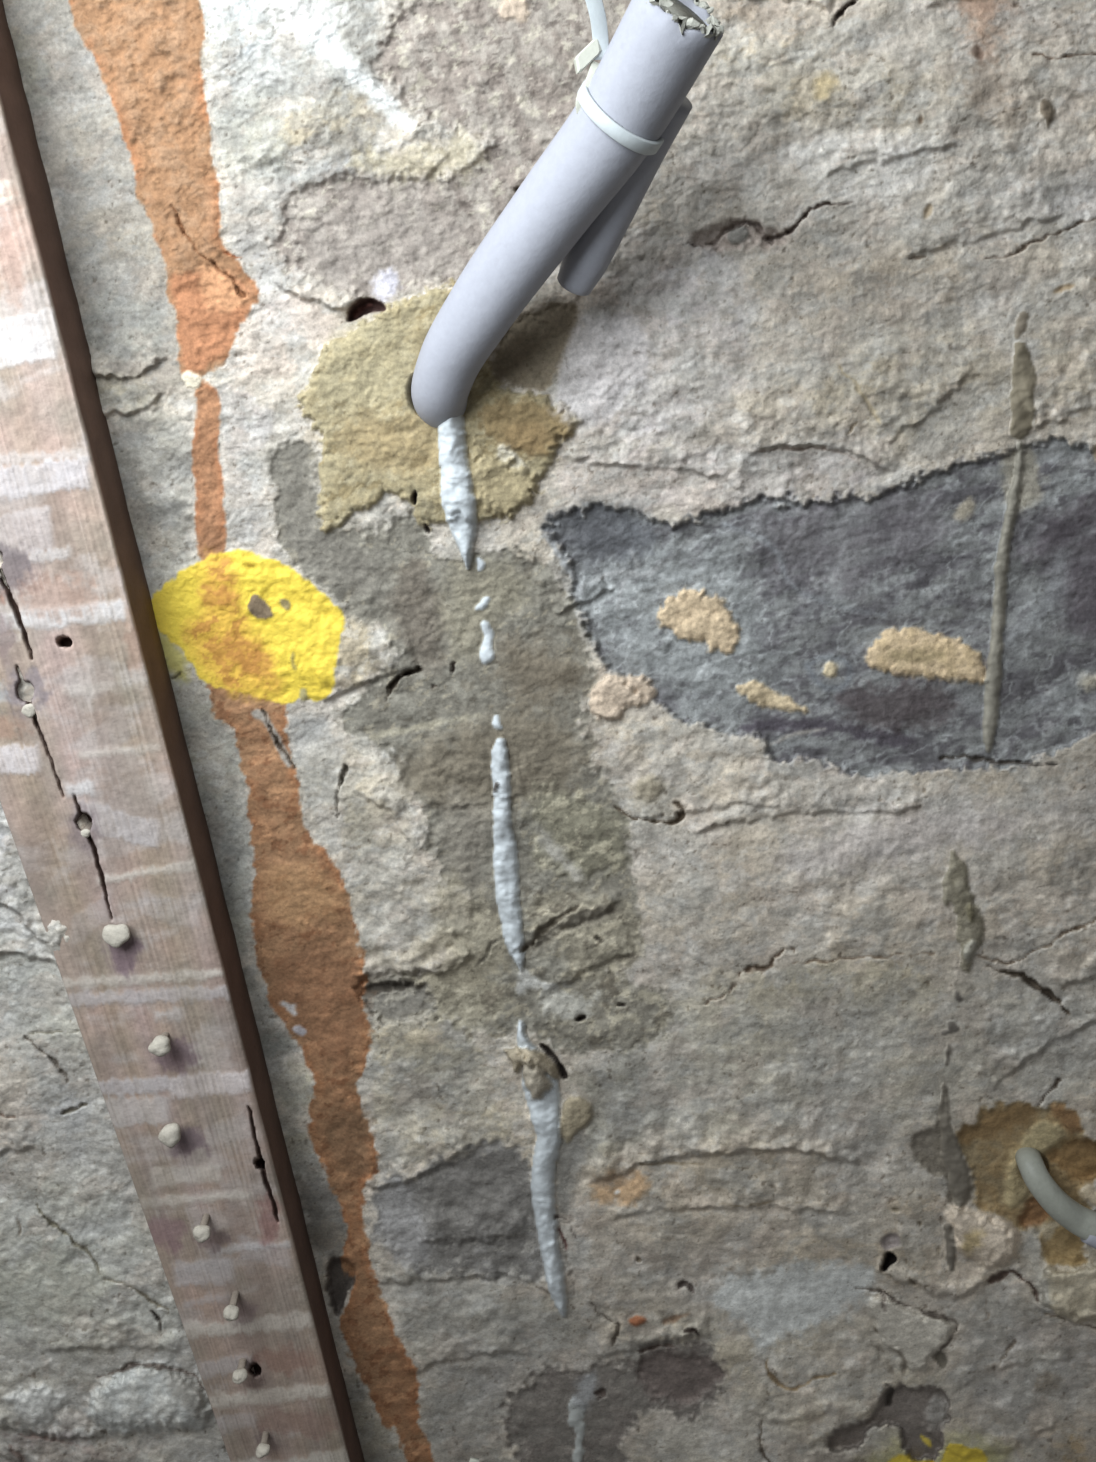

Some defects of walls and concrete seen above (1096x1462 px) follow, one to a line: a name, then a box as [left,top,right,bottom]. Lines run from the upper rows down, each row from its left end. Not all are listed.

crack [822,0,859,30]
crack [682,200,856,261]
crack [982,217,1096,262]
corrosion [66,0,437,1462]
crack [703,946,936,1006]
crack [973,914,1096,1017]
crack [21,1028,90,1117]
crack [14,1201,206,1393]
crack [7,1431,87,1462]